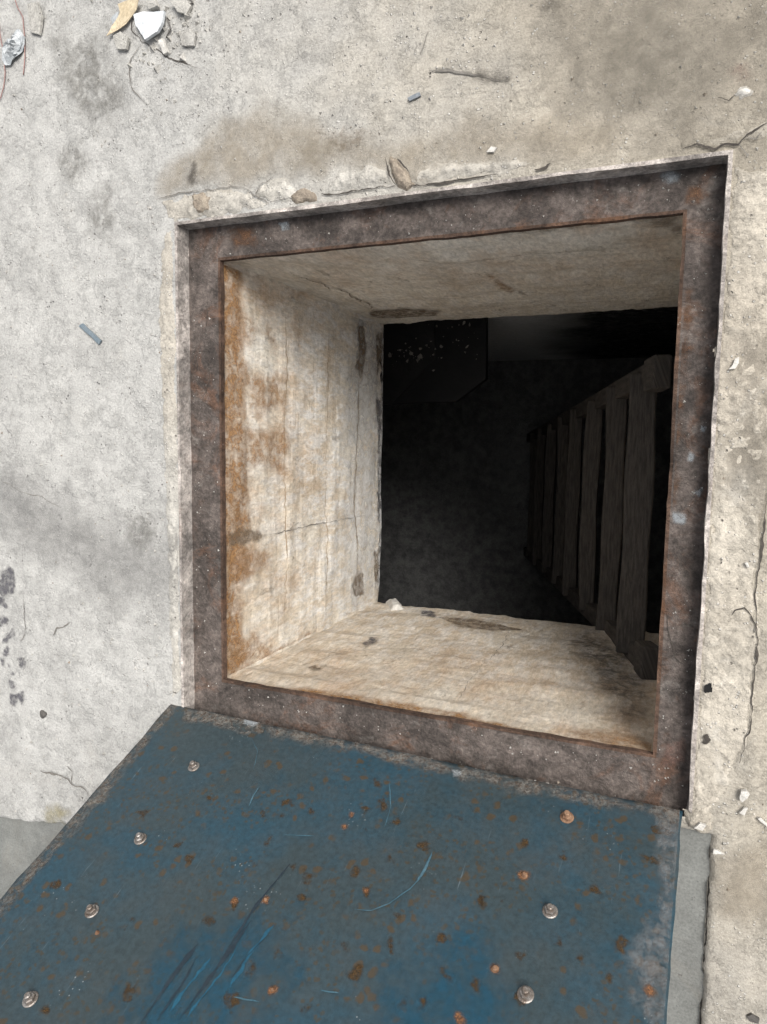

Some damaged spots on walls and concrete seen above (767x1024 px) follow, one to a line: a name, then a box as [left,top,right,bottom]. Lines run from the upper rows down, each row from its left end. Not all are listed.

crack [156,178,291,203]
crack [321,174,496,195]
crack [681,117,767,157]
crack [275,316,363,612]
rust [218,209,691,758]
crack [732,485,767,763]
rust [47,708,172,850]